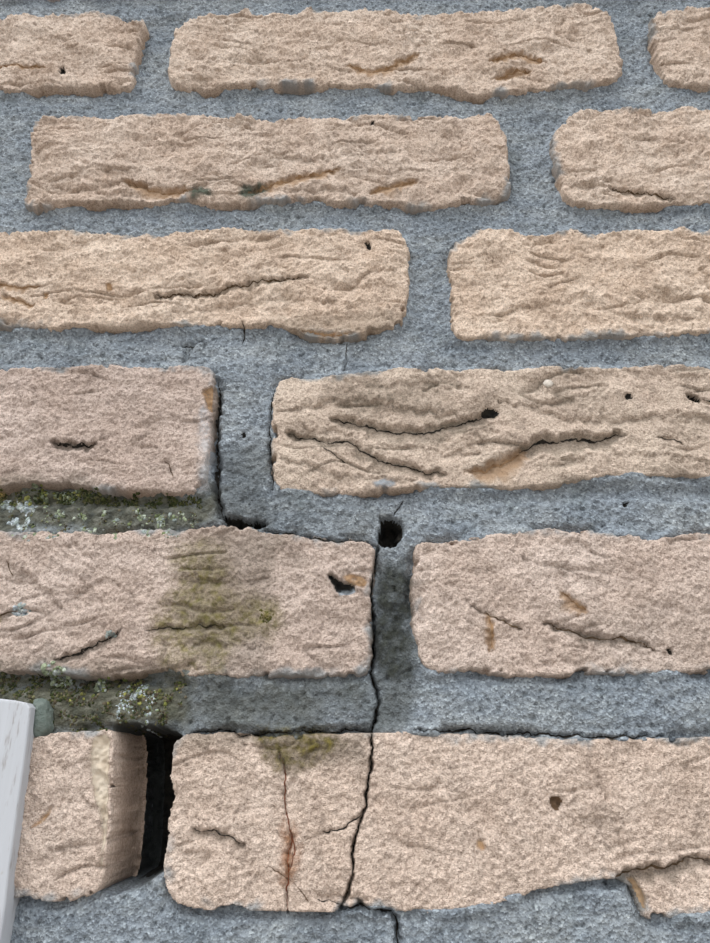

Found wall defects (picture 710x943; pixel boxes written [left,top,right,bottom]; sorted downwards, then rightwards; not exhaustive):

crack [195,531,399,943]